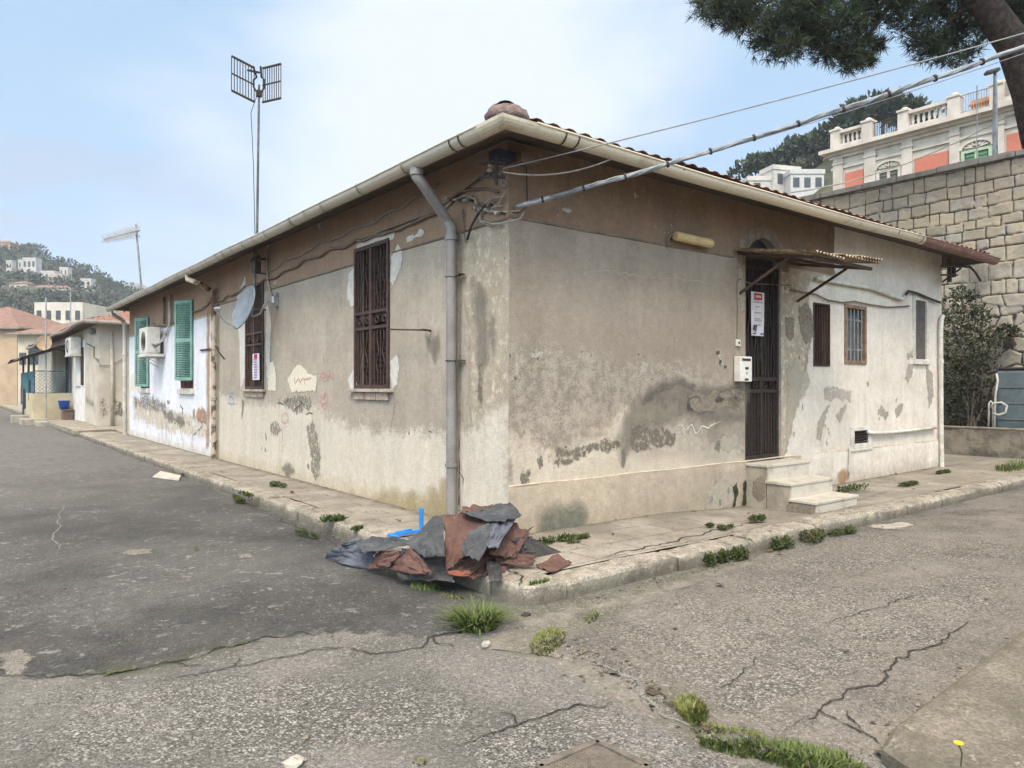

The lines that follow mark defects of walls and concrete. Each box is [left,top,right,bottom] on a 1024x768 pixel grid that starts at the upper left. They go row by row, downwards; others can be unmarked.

damp [475,285,495,401]
peeling [278,396,322,480]
peeling [520,423,676,486]
peeling [786,356,810,444]
peeling [817,386,851,446]
peeling [878,398,903,420]
peeling [905,350,934,409]